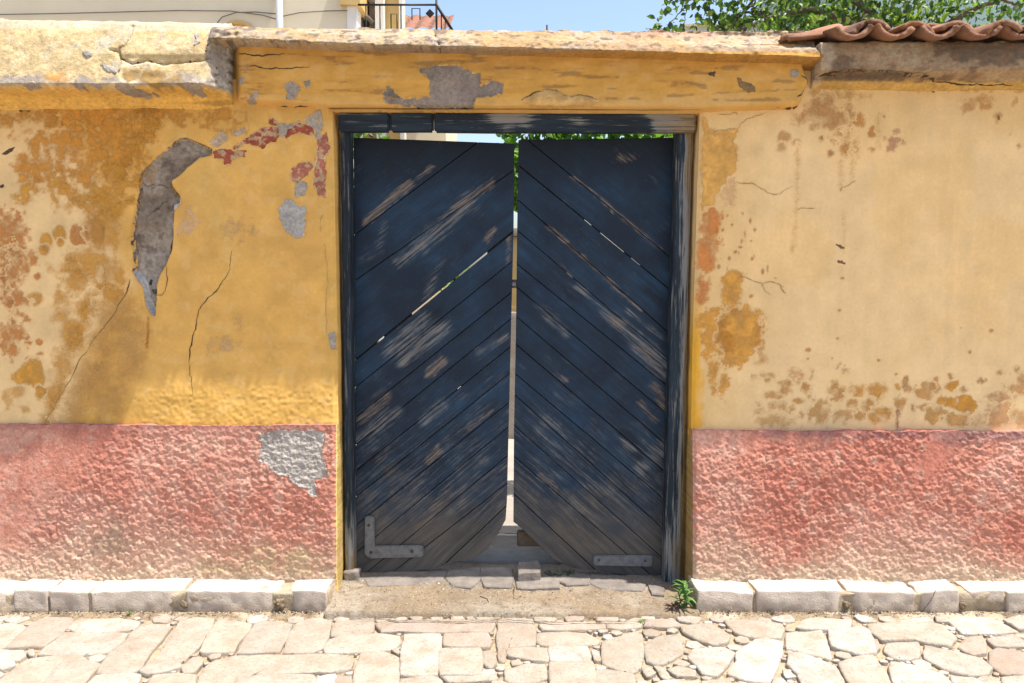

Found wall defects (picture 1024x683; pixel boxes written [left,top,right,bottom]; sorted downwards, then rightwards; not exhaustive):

peeling [383,64,503,112]
crack [45,253,130,423]
crack [189,250,232,392]
spalling [131,109,331,316]
crack [727,266,786,294]
crack [735,162,814,210]